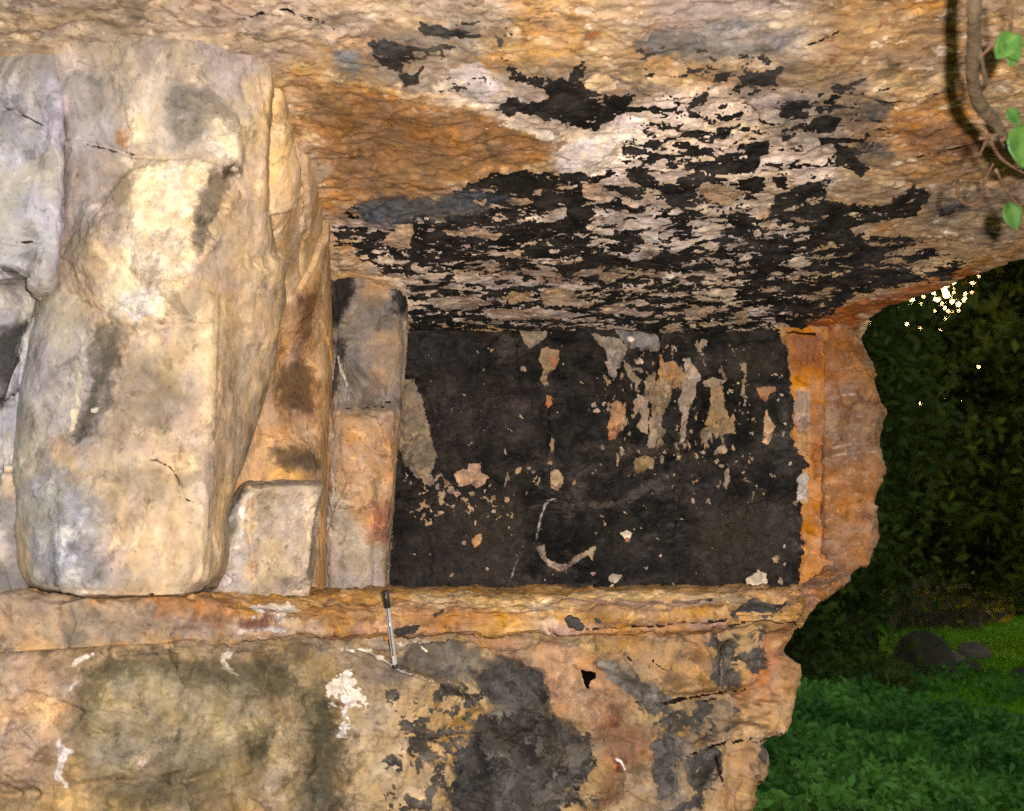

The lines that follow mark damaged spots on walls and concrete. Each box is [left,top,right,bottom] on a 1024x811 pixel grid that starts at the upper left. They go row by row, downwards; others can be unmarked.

peeling [448,62,508,103]
peeling [584,74,622,94]
peeling [486,119,637,202]
peeling [384,223,414,249]
peeling [442,226,502,240]
peeling [427,288,653,413]
peeling [588,329,811,508]
peeling [398,379,576,549]
peeling [536,514,606,581]
peeling [746,542,797,585]
water stain [342,646,411,675]
water stain [307,669,369,770]